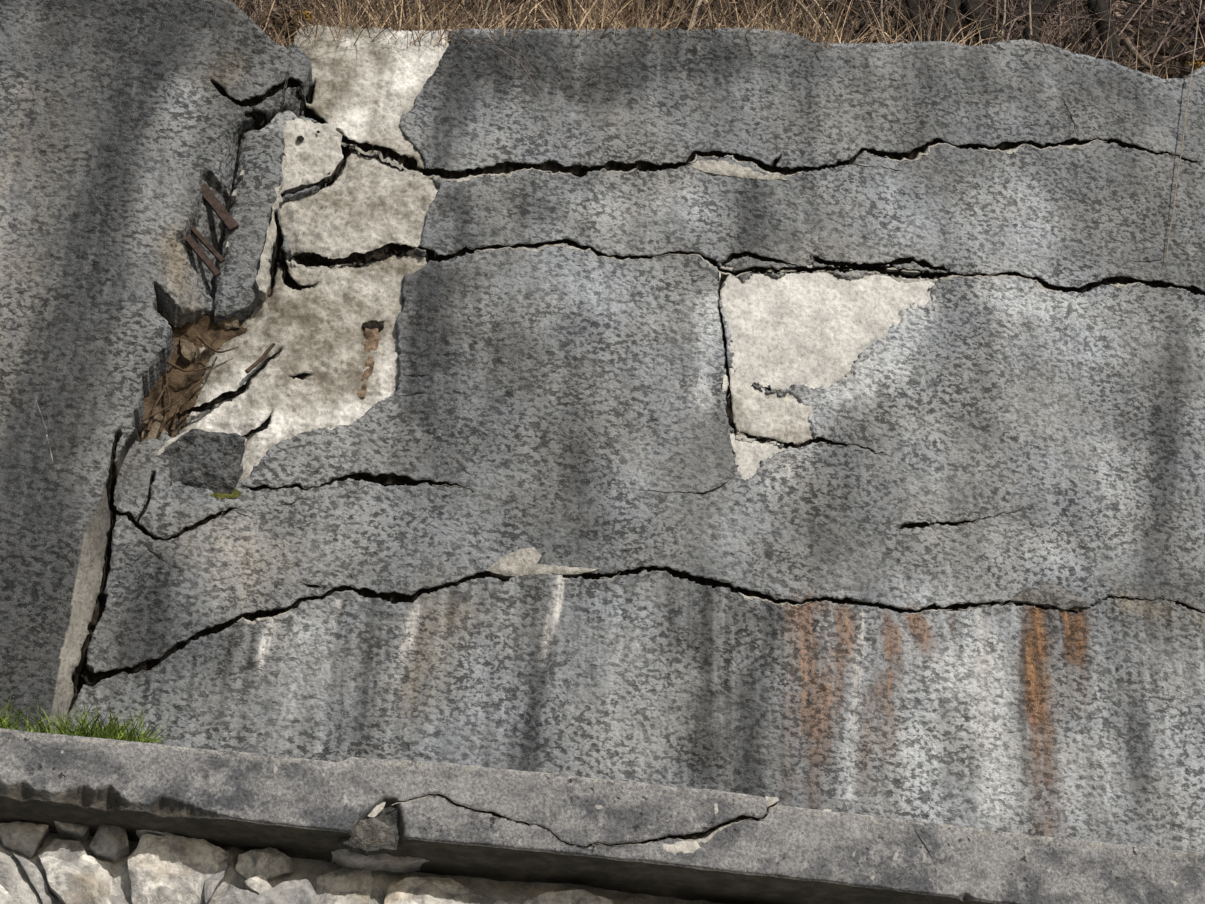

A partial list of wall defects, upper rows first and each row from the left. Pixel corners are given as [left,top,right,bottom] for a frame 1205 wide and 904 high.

spalling [138,24,451,482]
crack [212,77,1205,456]
crack [176,349,311,419]
rust [357,320,385,399]
spalling [717,264,938,481]
crack [69,433,508,712]
rust [788,598,853,760]
crack [551,566,1205,614]
rust [878,614,931,715]
rust [1023,606,1052,784]
rust [1062,611,1086,663]
crack [391,794,778,848]